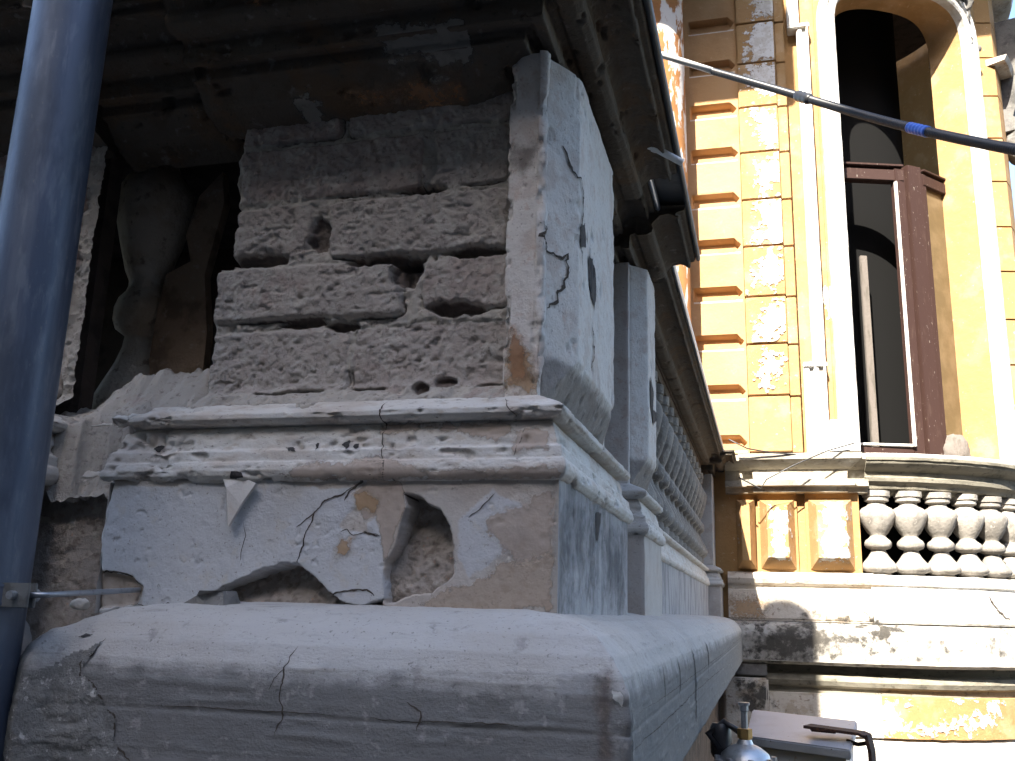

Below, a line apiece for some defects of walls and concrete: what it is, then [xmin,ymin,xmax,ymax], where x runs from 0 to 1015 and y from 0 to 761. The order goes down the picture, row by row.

crack [538,146,584,308]
peeling [738,0,788,393]
corrosion [504,326,535,394]
crack [297,403,419,563]
peeling [231,440,561,612]
peeling [818,495,871,573]
spalling [885,496,899,509]
spalling [886,525,904,576]
spalling [918,529,934,576]
spalling [949,532,961,562]
water stain [743,610,904,664]
crack [156,648,330,733]